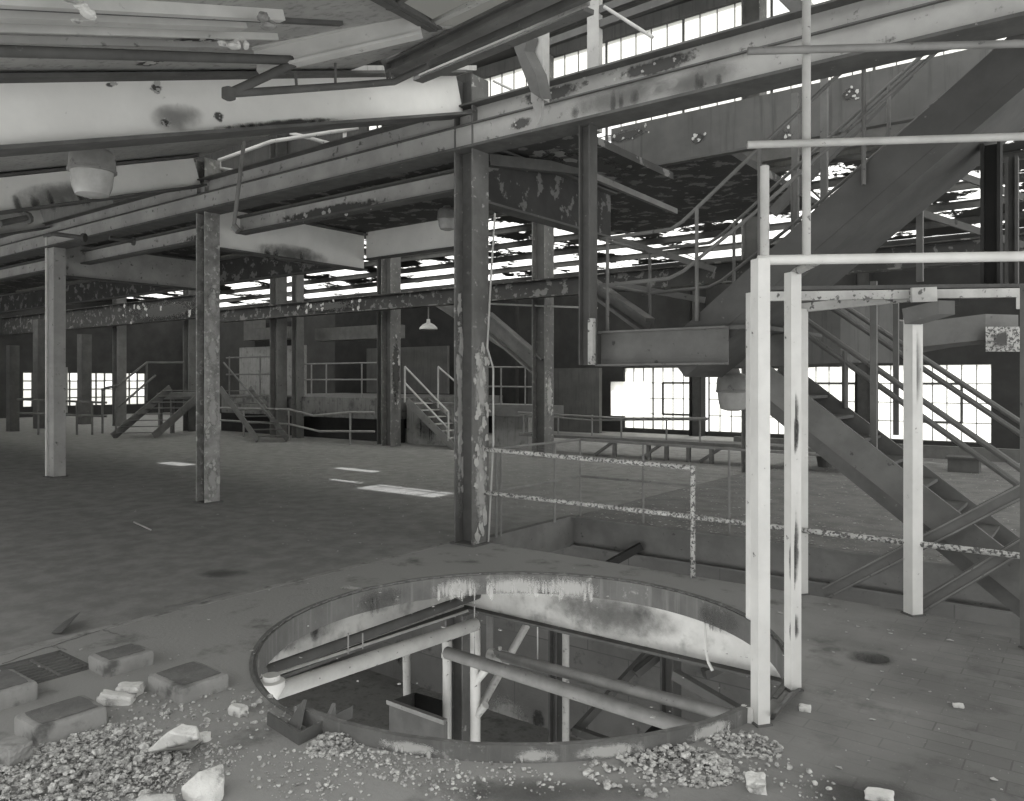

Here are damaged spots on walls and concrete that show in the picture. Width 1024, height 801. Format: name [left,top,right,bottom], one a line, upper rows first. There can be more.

peeling [122,301,196,324]
peeling [297,299,361,314]
peeling [455,293,490,543]
damp [438,579,646,628]